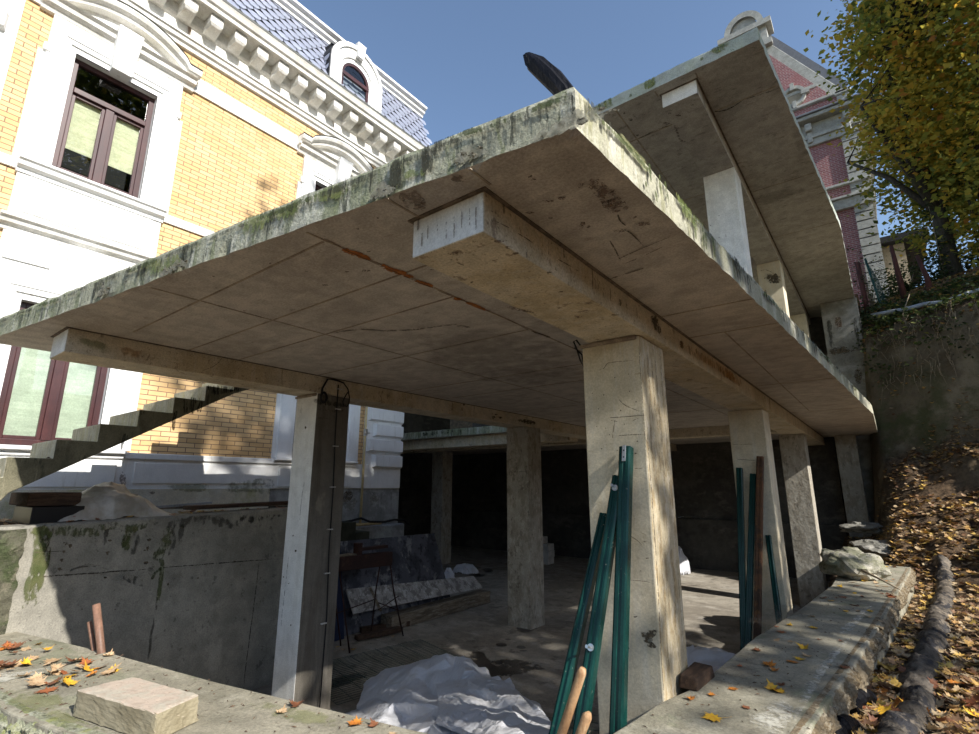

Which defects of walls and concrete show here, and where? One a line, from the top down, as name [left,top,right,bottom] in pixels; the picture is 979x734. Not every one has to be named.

leakage [482,103,542,141]
leakage [570,95,612,138]
leakage [422,137,453,173]
leakage [389,155,477,246]
leakage [578,179,669,316]
corrosion [326,239,549,337]
leakage [30,522,147,554]
leakage [168,515,280,555]
spalling [641,630,656,648]